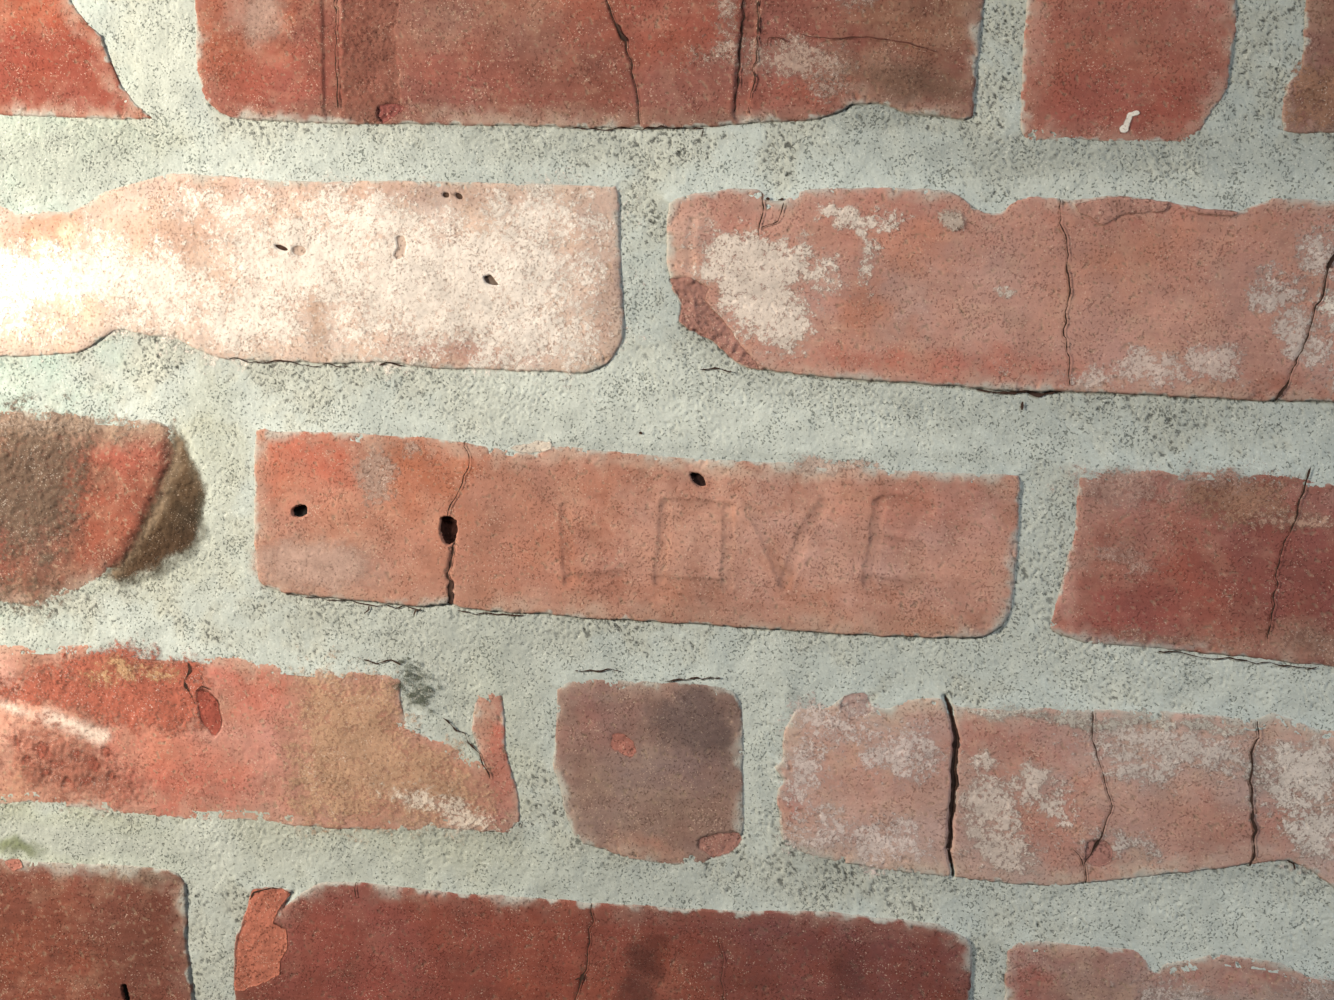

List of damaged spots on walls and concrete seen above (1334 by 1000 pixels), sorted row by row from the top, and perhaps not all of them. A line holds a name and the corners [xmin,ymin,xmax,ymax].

water stain [0,163,640,387]
spalling [670,277,758,368]
efflorescence [680,203,913,363]
crack [1059,198,1071,385]
efflorescence [1244,216,1334,392]
crack [1275,254,1334,401]
crack [446,442,470,604]
crack [1267,467,1311,644]
crack [945,697,959,875]
water stain [778,692,1179,879]
water stain [1053,709,1334,875]
spalling [234,888,290,991]